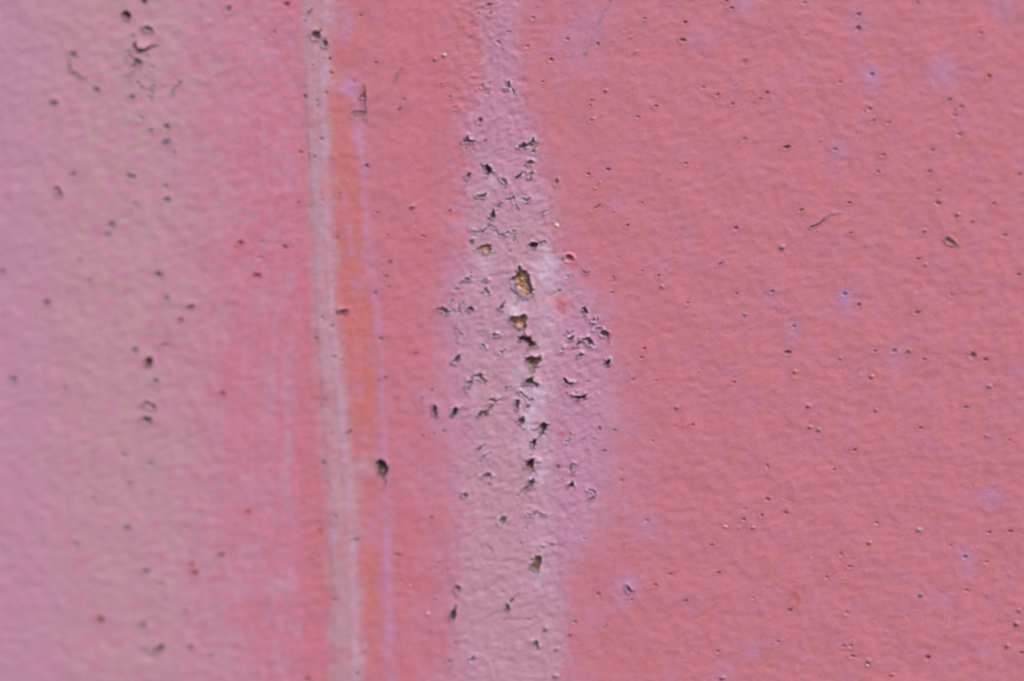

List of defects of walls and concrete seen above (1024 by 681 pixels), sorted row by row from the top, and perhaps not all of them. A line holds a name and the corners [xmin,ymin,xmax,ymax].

peeling [459,115,490,145]
peeling [516,136,537,181]
peeling [464,162,510,193]
peeling [474,192,497,220]
peeling [466,239,499,256]
peeling [526,239,547,250]
peeling [432,305,476,316]
peeling [565,305,612,367]
peeling [417,372,489,435]
peeling [458,264,576,500]
peeling [560,377,593,401]
peeling [529,553,543,575]